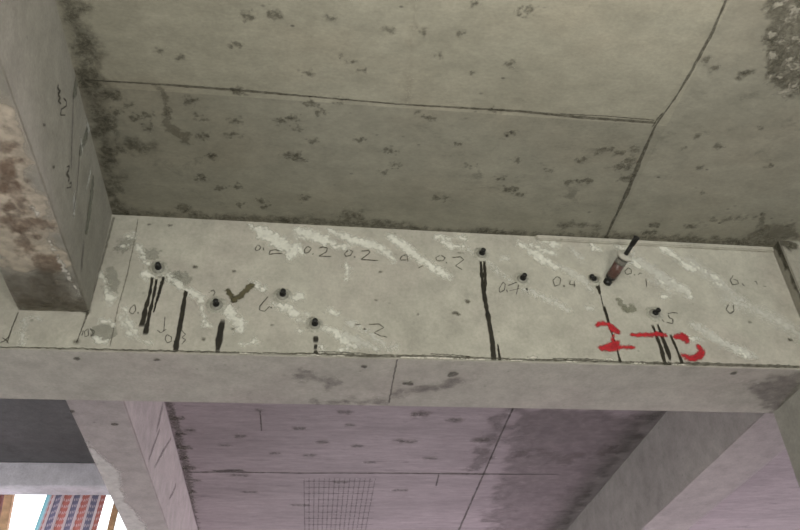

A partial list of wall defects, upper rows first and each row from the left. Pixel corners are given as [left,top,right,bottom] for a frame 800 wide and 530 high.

leakage [0,104,80,309]
leakage [269,213,415,230]
crack [73,0,727,237]
crack [0,298,799,401]